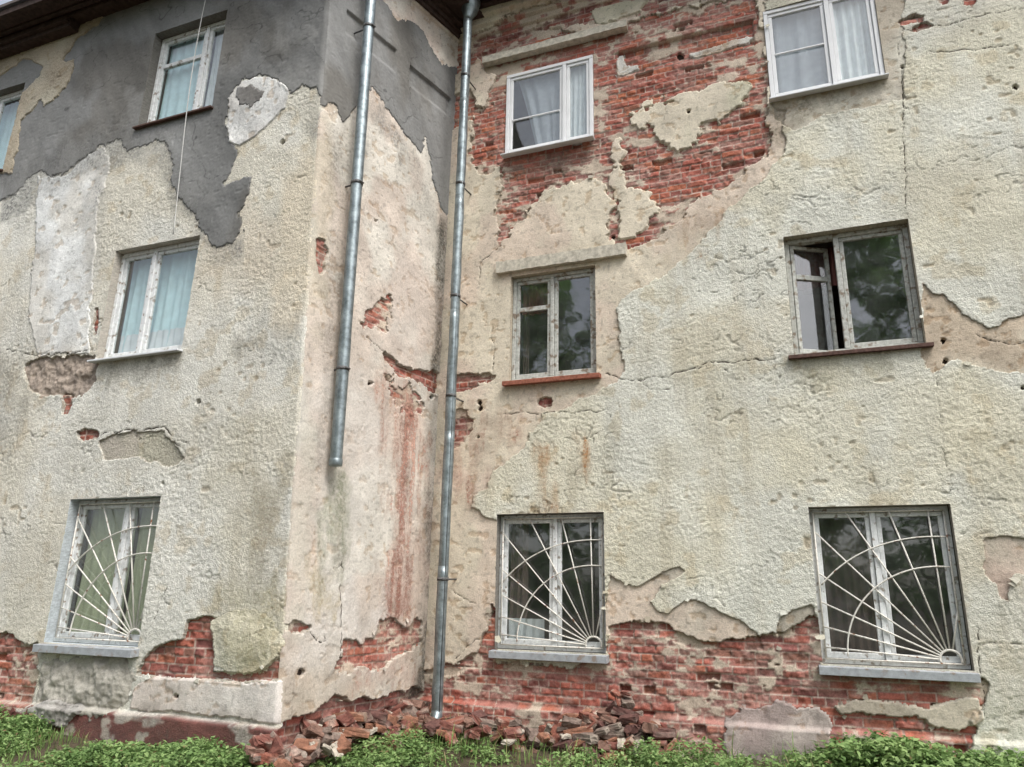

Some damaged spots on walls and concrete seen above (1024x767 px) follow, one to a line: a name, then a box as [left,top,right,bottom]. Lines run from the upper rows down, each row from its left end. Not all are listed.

peeling [0,17,103,175]
peeling [25,147,111,414]
peeling [79,429,184,467]
peeling [129,27,463,746]
peeling [442,0,989,757]
peeling [920,285,1024,373]
peeling [982,536,1024,600]
spalling [0,632,86,728]